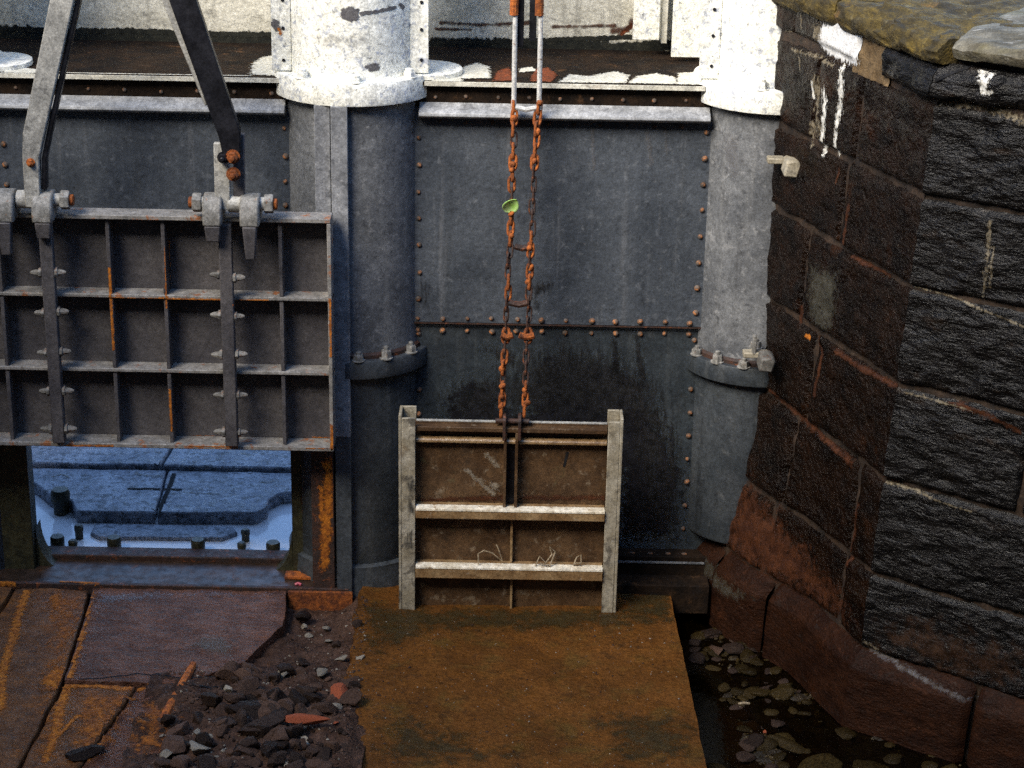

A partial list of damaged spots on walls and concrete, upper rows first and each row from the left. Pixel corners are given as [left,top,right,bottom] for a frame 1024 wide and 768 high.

damp [791,48,846,156]
rust [108,267,129,350]
rust [150,240,220,309]
rust [306,425,333,571]
damp [442,336,686,544]
rust [0,581,30,710]
rust [34,581,167,763]
spalling [284,713,338,725]